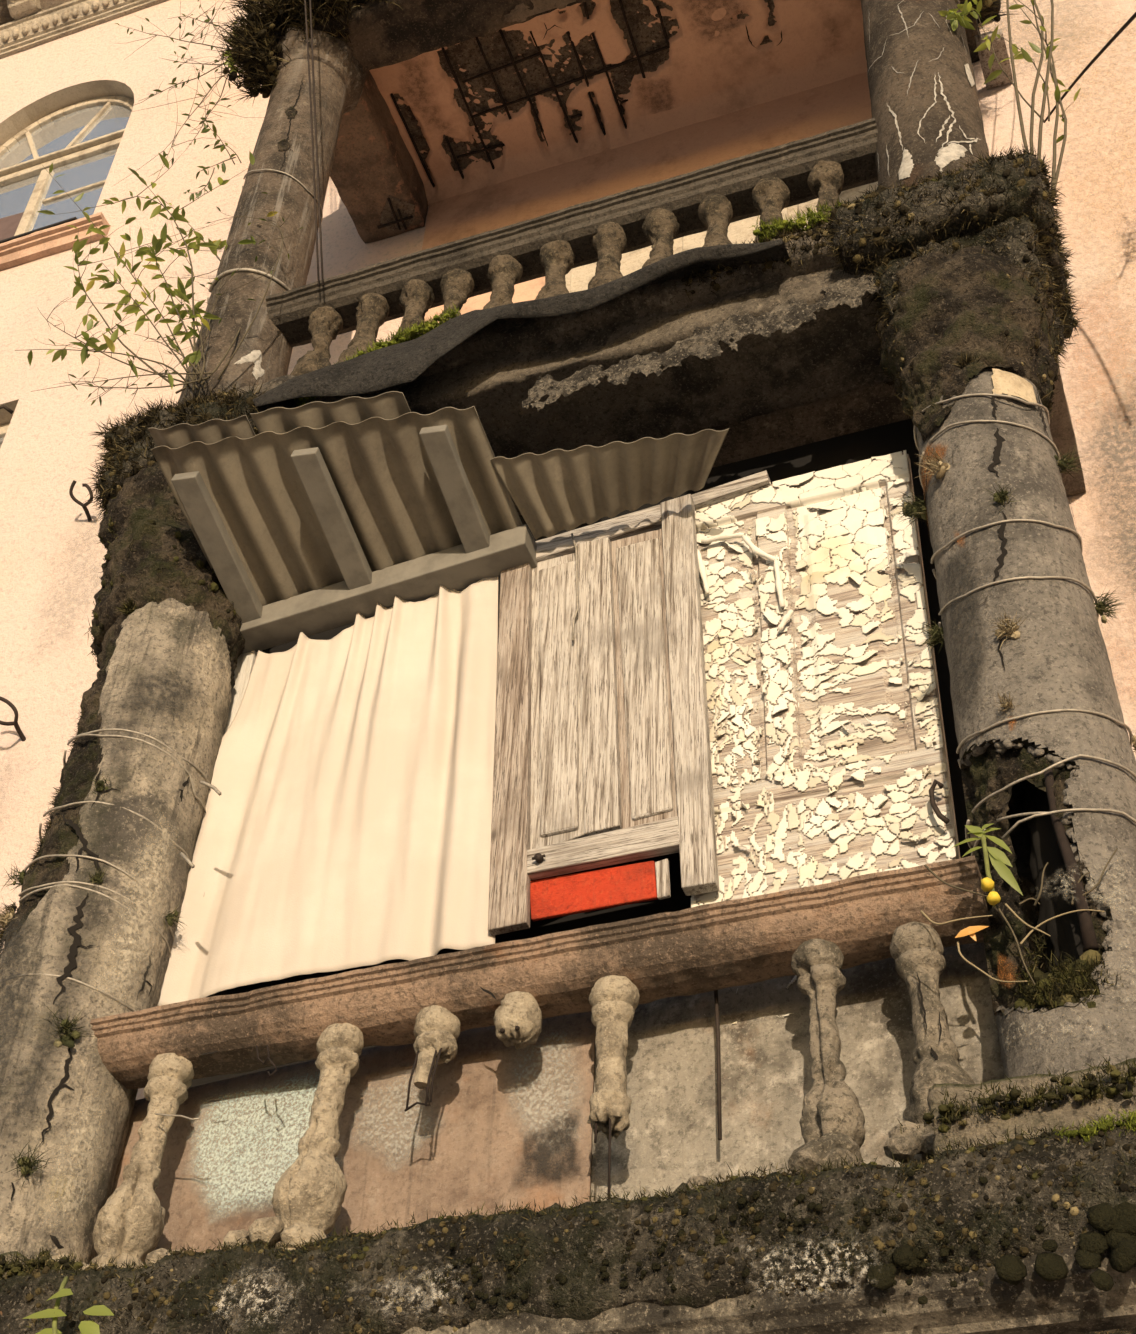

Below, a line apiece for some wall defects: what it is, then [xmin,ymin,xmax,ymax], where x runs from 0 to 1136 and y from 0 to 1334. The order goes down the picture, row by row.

flaking render [390,0,679,188]
flaking render [760,0,777,45]
crack [867,0,989,180]
spalling [522,275,881,411]
flaking render [911,345,1037,441]
crack [988,391,1005,477]
crack [1037,391,1053,447]
crack [976,512,1008,670]
peeling [691,450,1120,1016]
crack [53,769,120,1004]
crack [39,1048,74,1146]